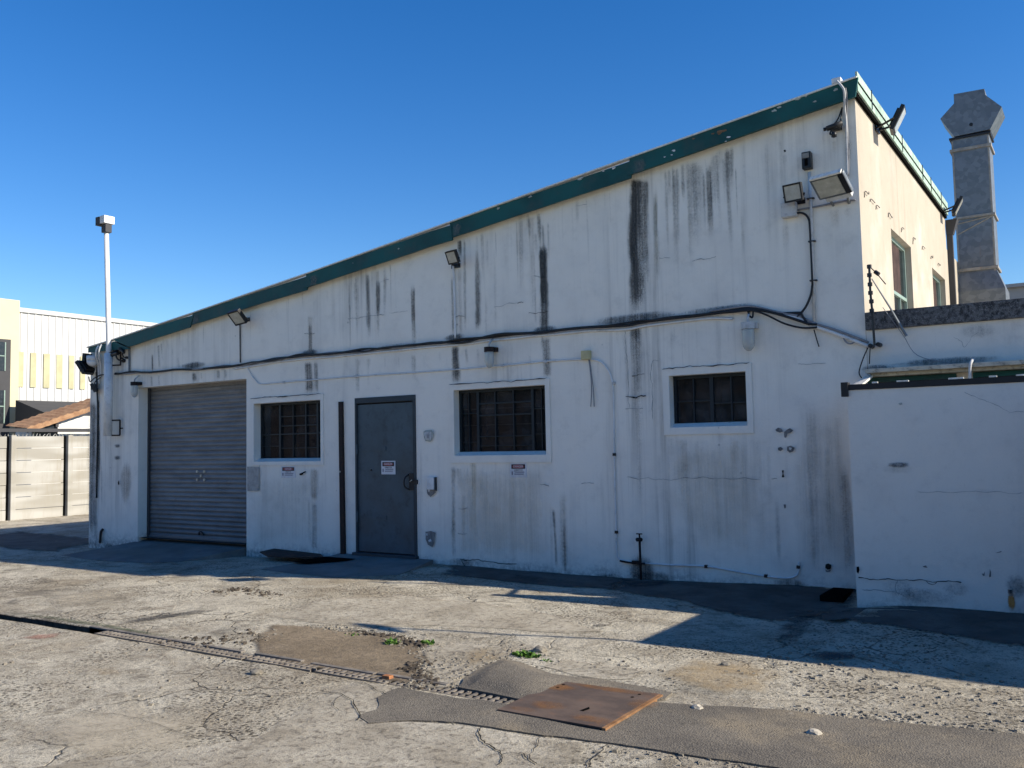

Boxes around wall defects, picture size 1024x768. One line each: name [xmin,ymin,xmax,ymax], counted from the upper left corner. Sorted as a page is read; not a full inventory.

water stain [535,238,553,370]
water stain [607,181,659,375]